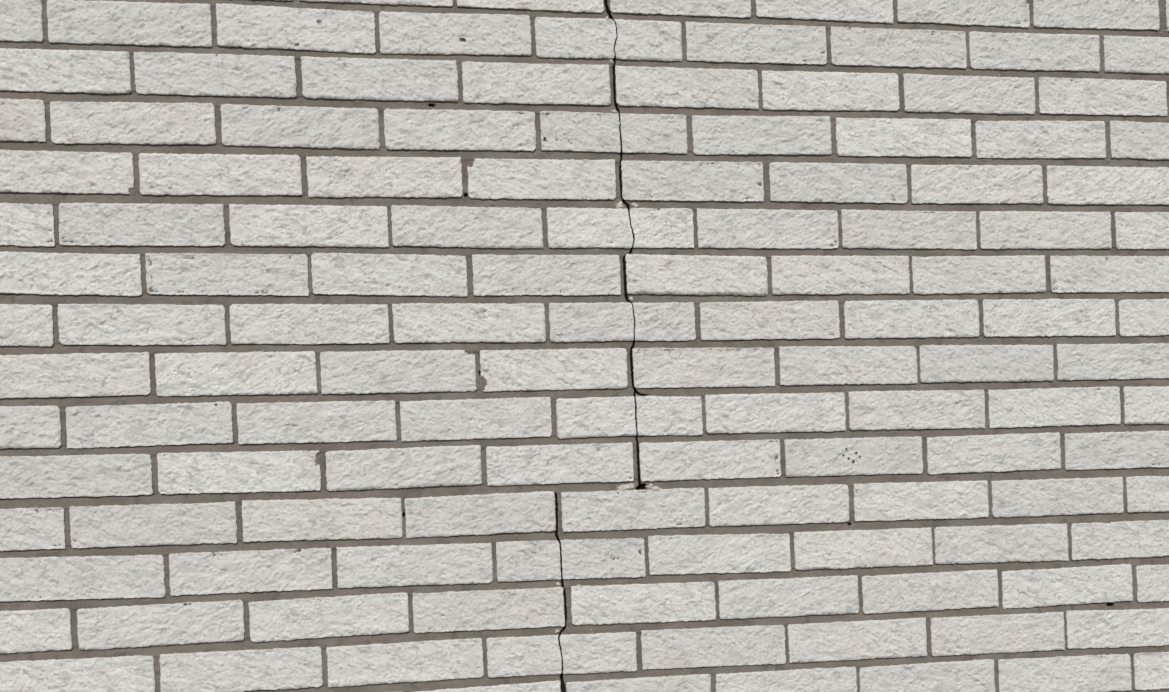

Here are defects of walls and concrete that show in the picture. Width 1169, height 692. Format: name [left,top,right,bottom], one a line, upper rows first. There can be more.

crack [604,0,647,490]
crack [555,493,583,692]